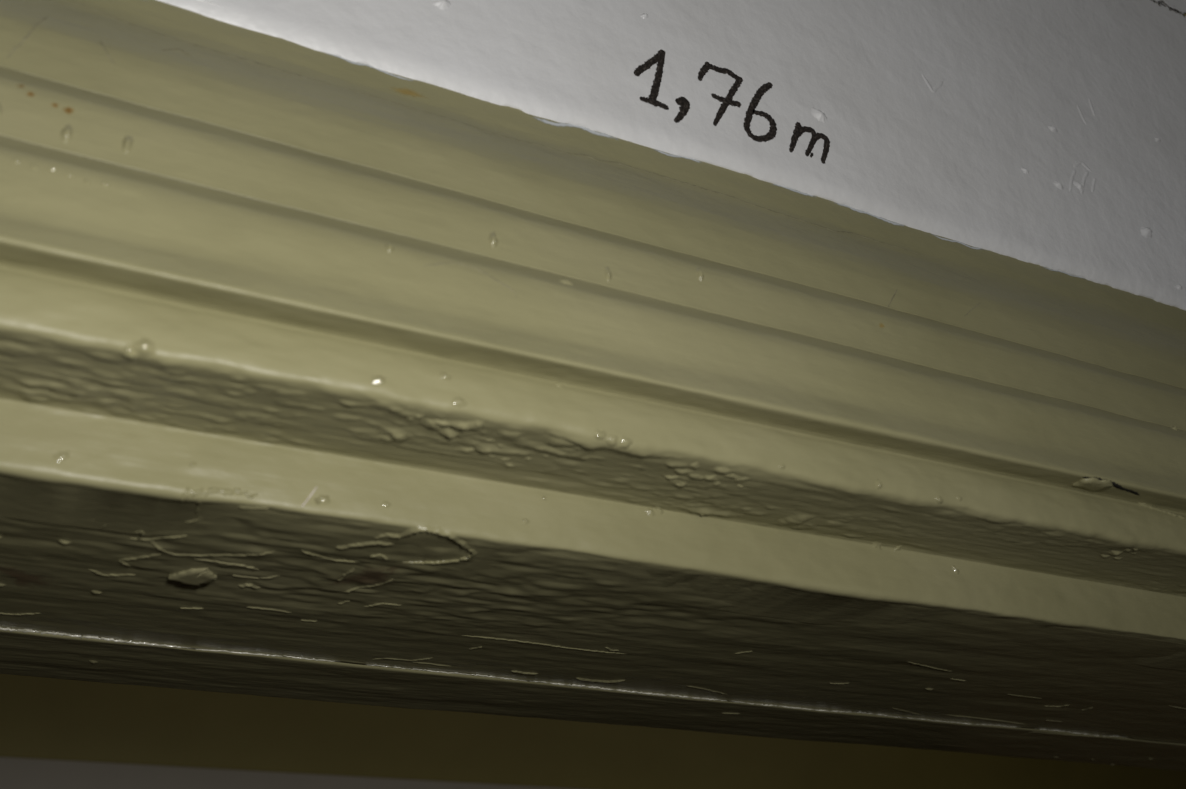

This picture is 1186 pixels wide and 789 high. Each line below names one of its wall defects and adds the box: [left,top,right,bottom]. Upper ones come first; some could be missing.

crack [1150,0,1186,18]
peeling [88,487,280,589]
peeling [302,524,478,604]